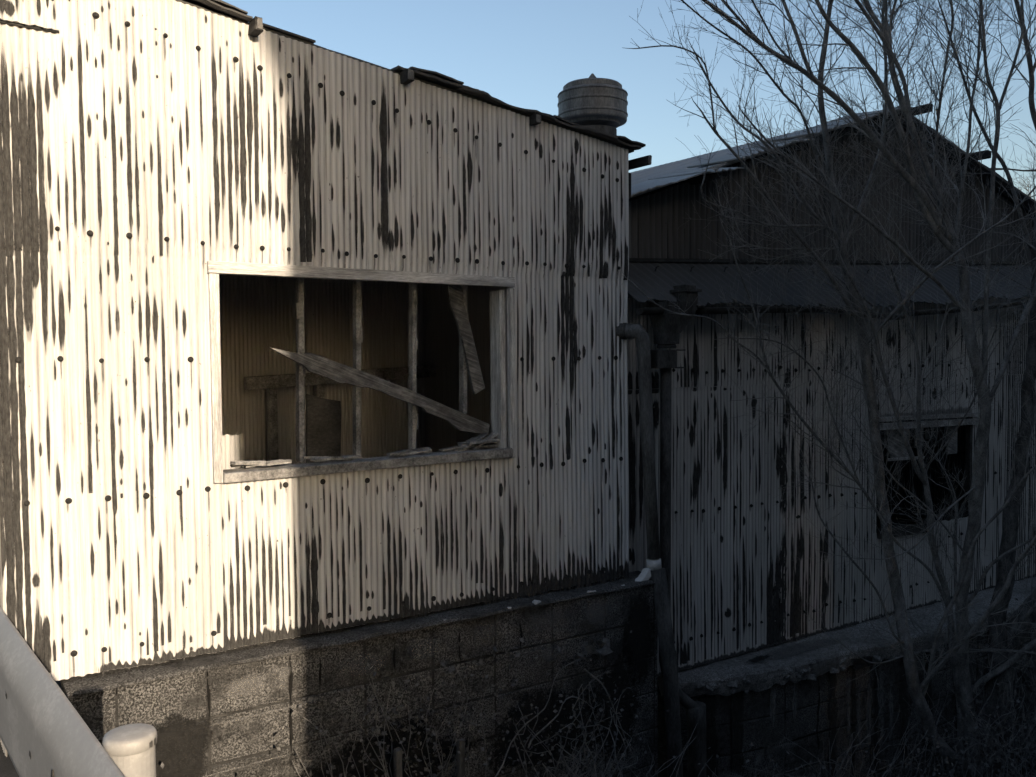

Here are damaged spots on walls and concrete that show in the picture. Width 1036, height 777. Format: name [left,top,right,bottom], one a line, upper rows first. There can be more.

rust [673,313,951,670]
rust [871,306,979,411]
rust [969,316,1005,594]